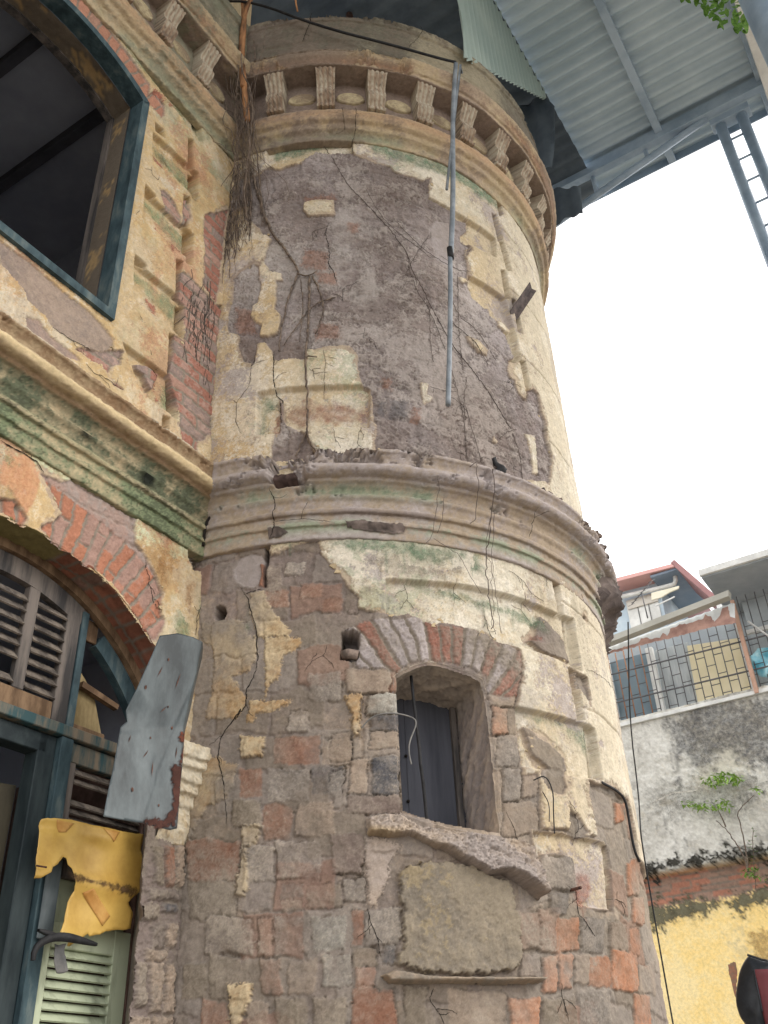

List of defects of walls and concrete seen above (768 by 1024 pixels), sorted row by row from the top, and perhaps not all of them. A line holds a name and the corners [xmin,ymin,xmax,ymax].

spalling [0,152,552,483]
crack [312,223,358,300]
flaking render [0,454,165,643]
crack [269,489,329,536]
corrosion [142,731,185,829]
crack [213,589,260,822]
spalling [173,543,669,1024]
mould [644,841,768,934]